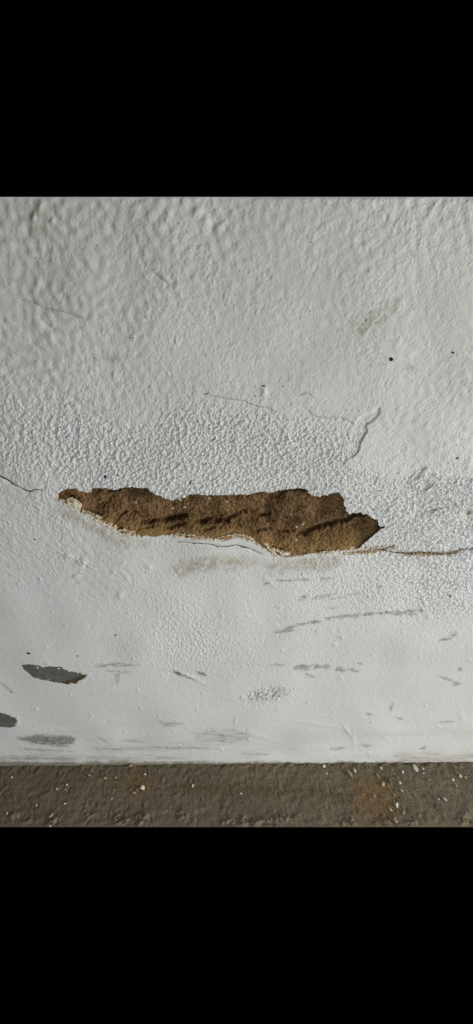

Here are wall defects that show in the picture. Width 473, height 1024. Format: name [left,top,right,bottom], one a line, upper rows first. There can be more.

spalling [57,474,391,558]
crack [381,545,473,557]
peeling [22,652,91,686]
peeling [0,713,20,728]